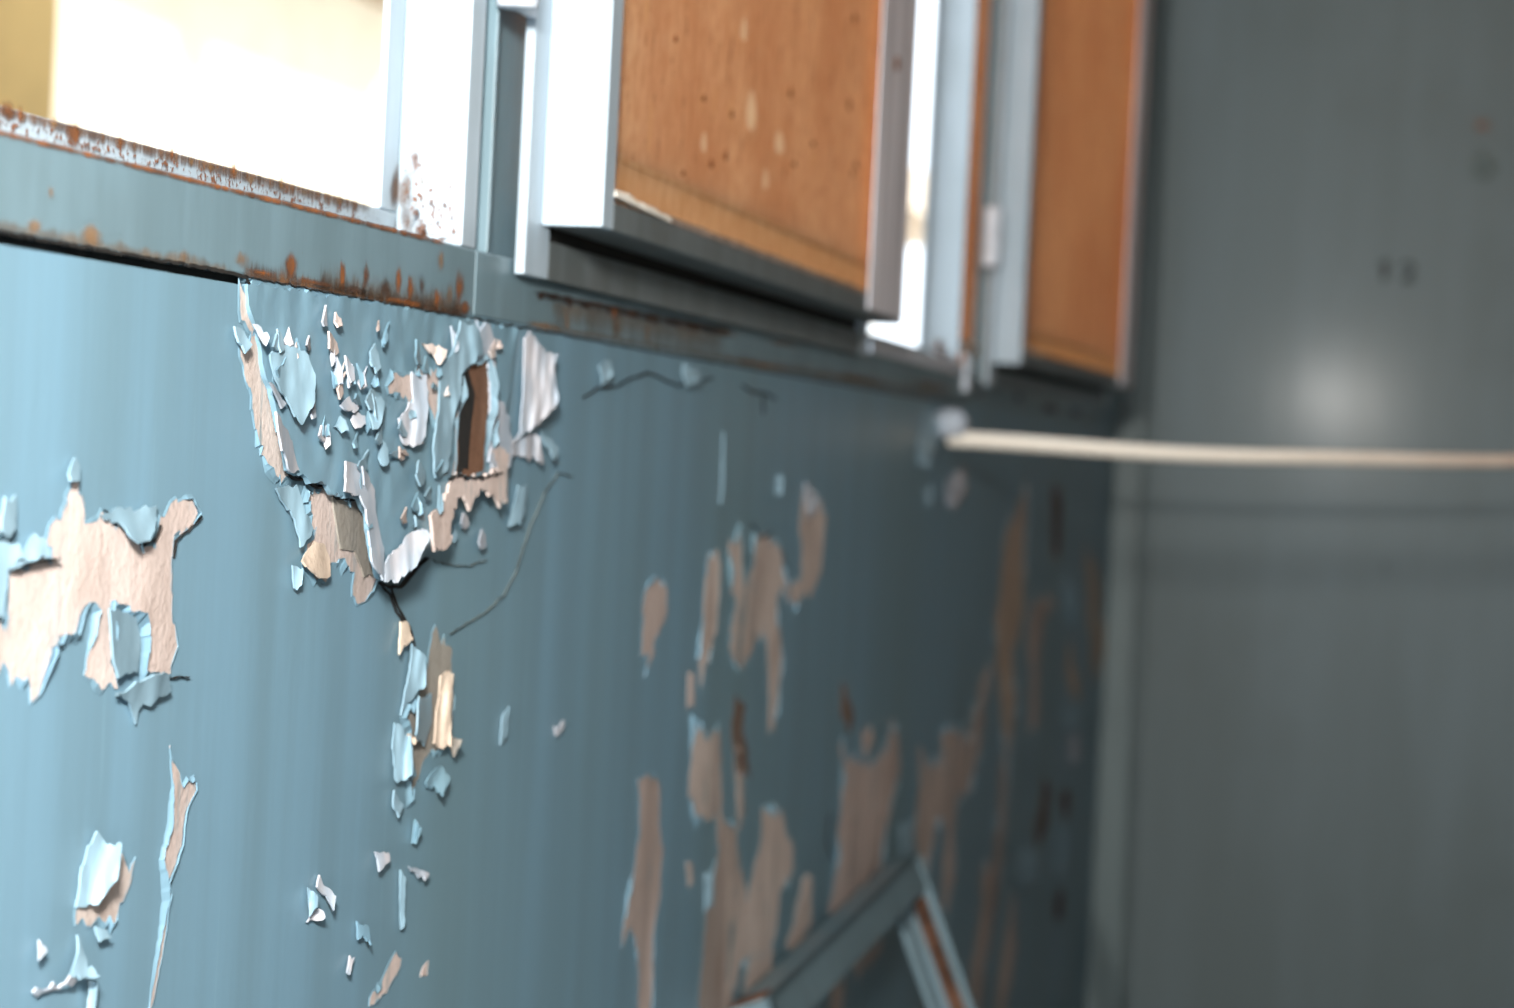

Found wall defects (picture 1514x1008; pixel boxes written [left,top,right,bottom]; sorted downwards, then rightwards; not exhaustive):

corrosion [0,103,461,264]
corrosion [239,255,469,315]
crack [0,229,965,414]
peeling [0,457,203,725]
peeling [233,278,559,844]
crack [378,472,573,635]
peeling [686,481,984,1008]
peeling [31,831,136,1008]
peeling [149,745,198,1008]
peeling [306,875,336,923]
peeling [374,852,430,930]
peeling [620,770,663,1008]